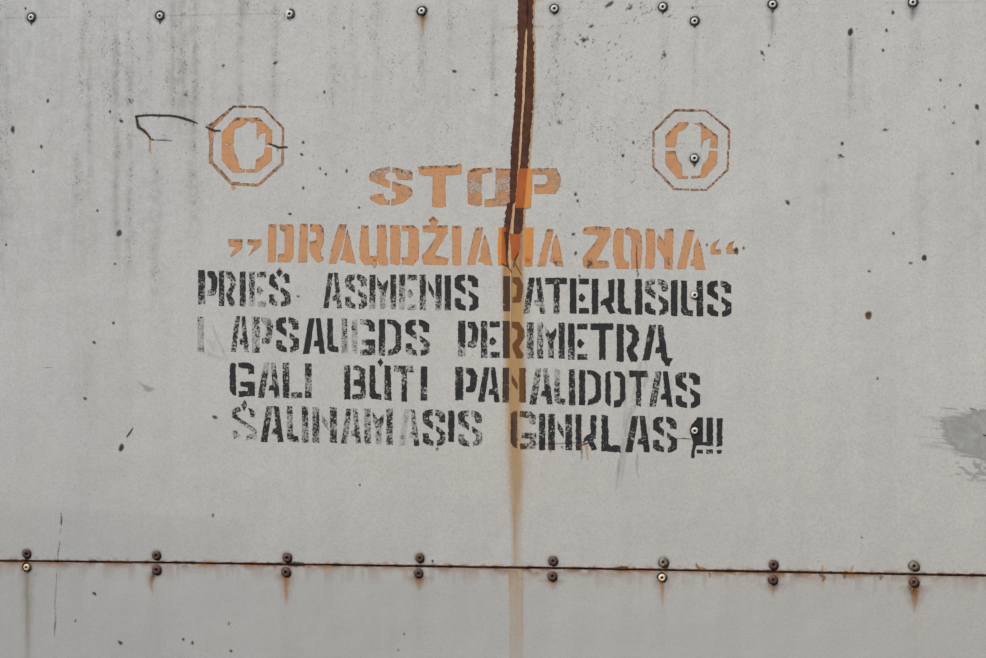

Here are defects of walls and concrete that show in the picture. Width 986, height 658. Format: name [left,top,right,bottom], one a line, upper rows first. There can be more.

crack [135,114,221,141]
corrosion [503,208,526,413]
peeling [941,408,986,477]
corrosion [0,559,986,603]